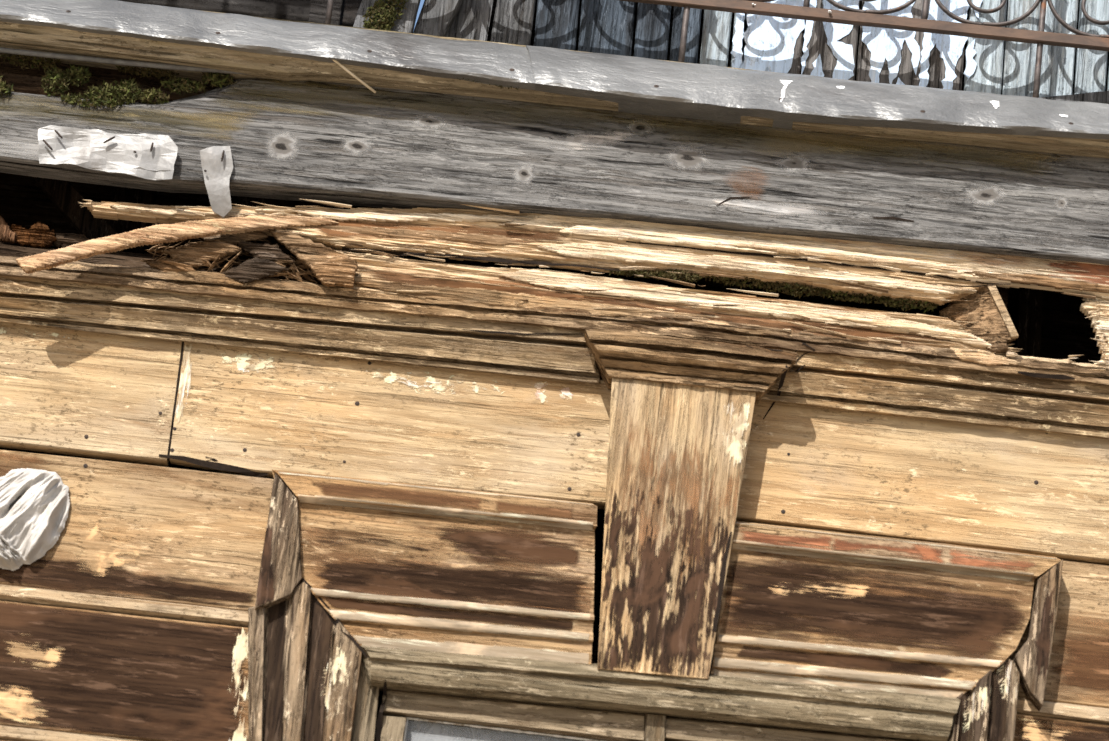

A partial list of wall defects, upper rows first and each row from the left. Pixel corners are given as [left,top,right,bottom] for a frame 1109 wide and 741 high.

peeling [731,0,983,90]
crack [342,247,620,271]
crack [626,241,1011,287]
crack [745,342,815,419]
damp [598,436,1023,678]
damp [0,527,286,741]
damp [304,528,586,741]
damp [1034,587,1109,692]
damp [954,691,970,741]
damp [988,661,1008,741]
damp [1018,718,1109,741]